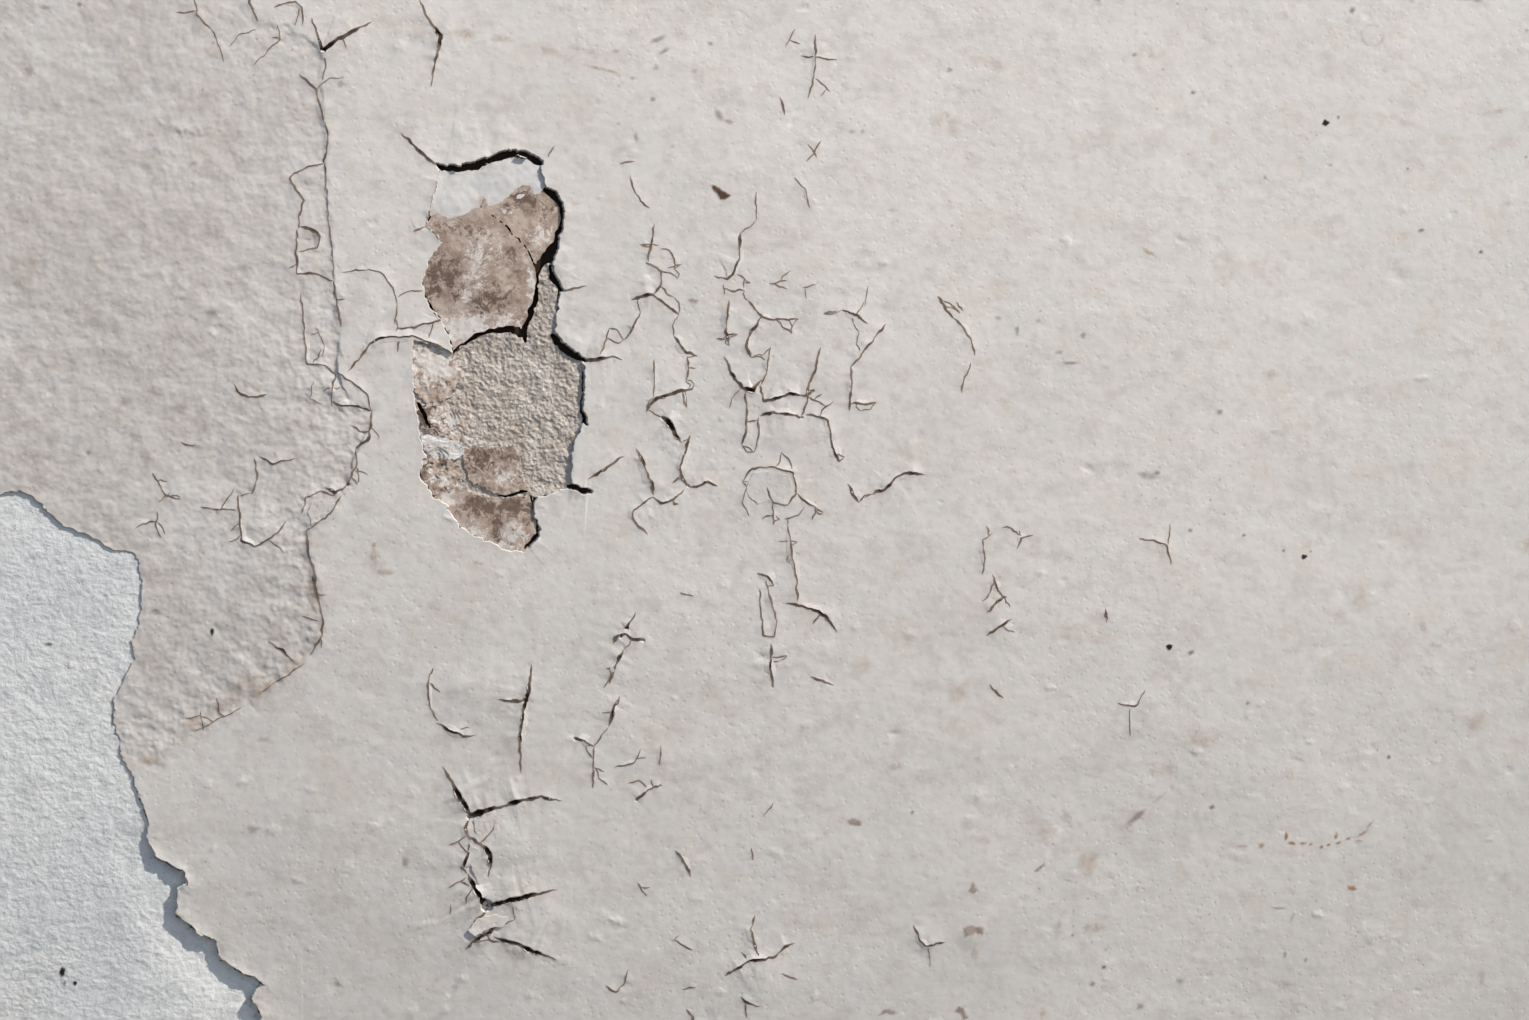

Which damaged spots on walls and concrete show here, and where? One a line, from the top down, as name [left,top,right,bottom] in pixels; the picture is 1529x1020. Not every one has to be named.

crack [135,456,295,553]
crack [178,0,447,413]
peeling [260,412,379,693]
flaking render [401,133,624,552]
crack [599,161,924,687]
crack [794,141,821,208]
crack [780,29,837,114]
peeling [0,491,265,1020]
crack [427,612,662,960]